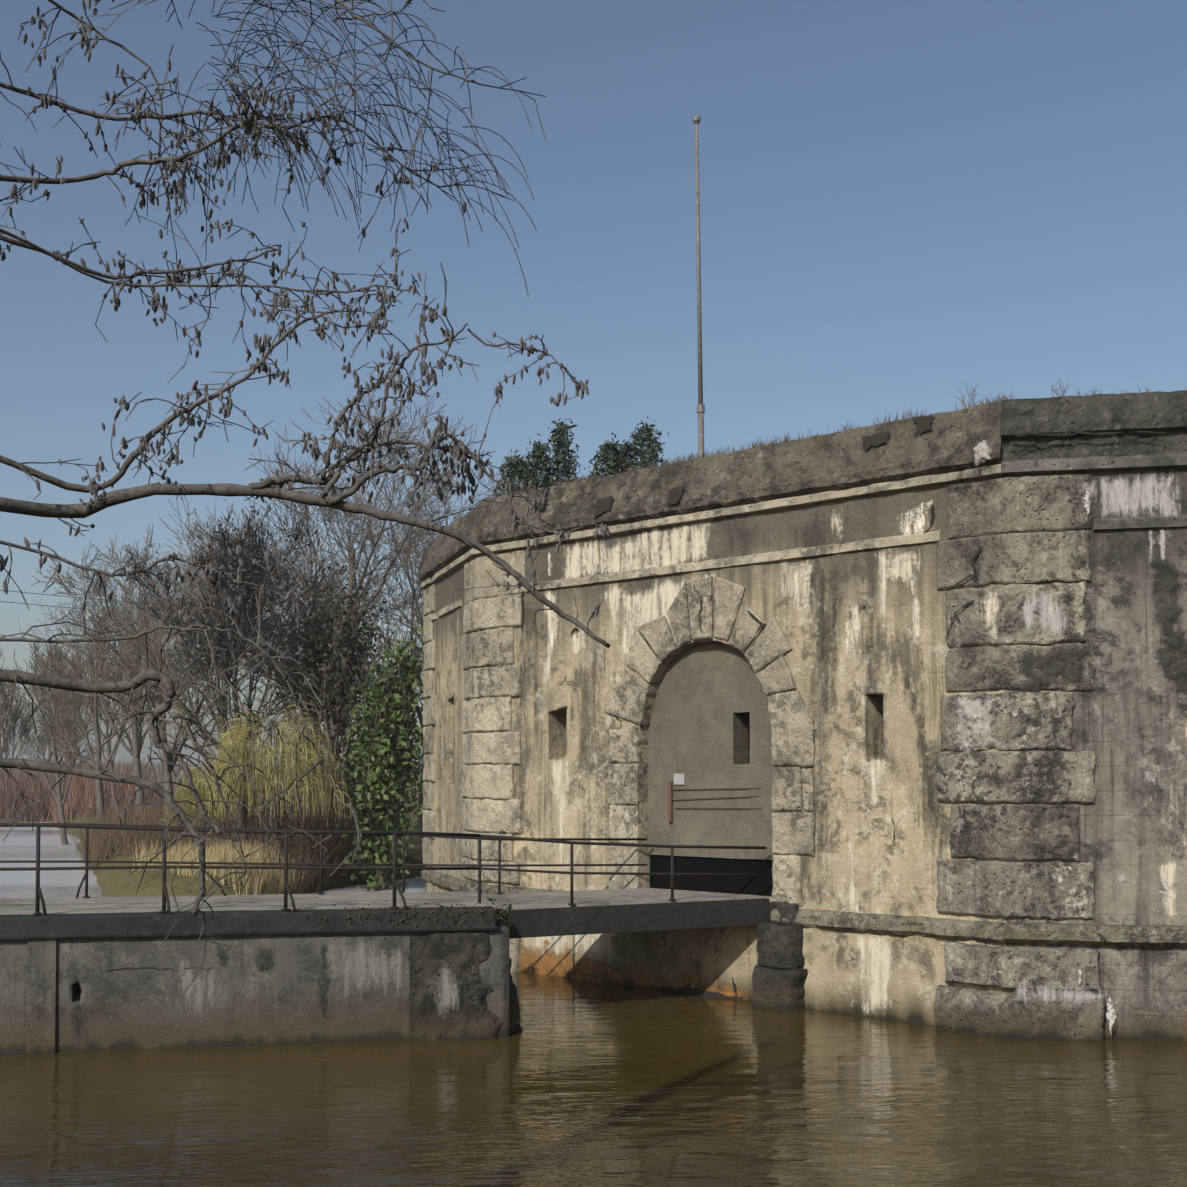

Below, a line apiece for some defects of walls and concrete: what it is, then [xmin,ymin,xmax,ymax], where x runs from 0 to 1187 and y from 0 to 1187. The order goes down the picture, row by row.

damp [1083,473,1181,562]
spalling [1149,559,1187,722]
rust [520,940,748,999]